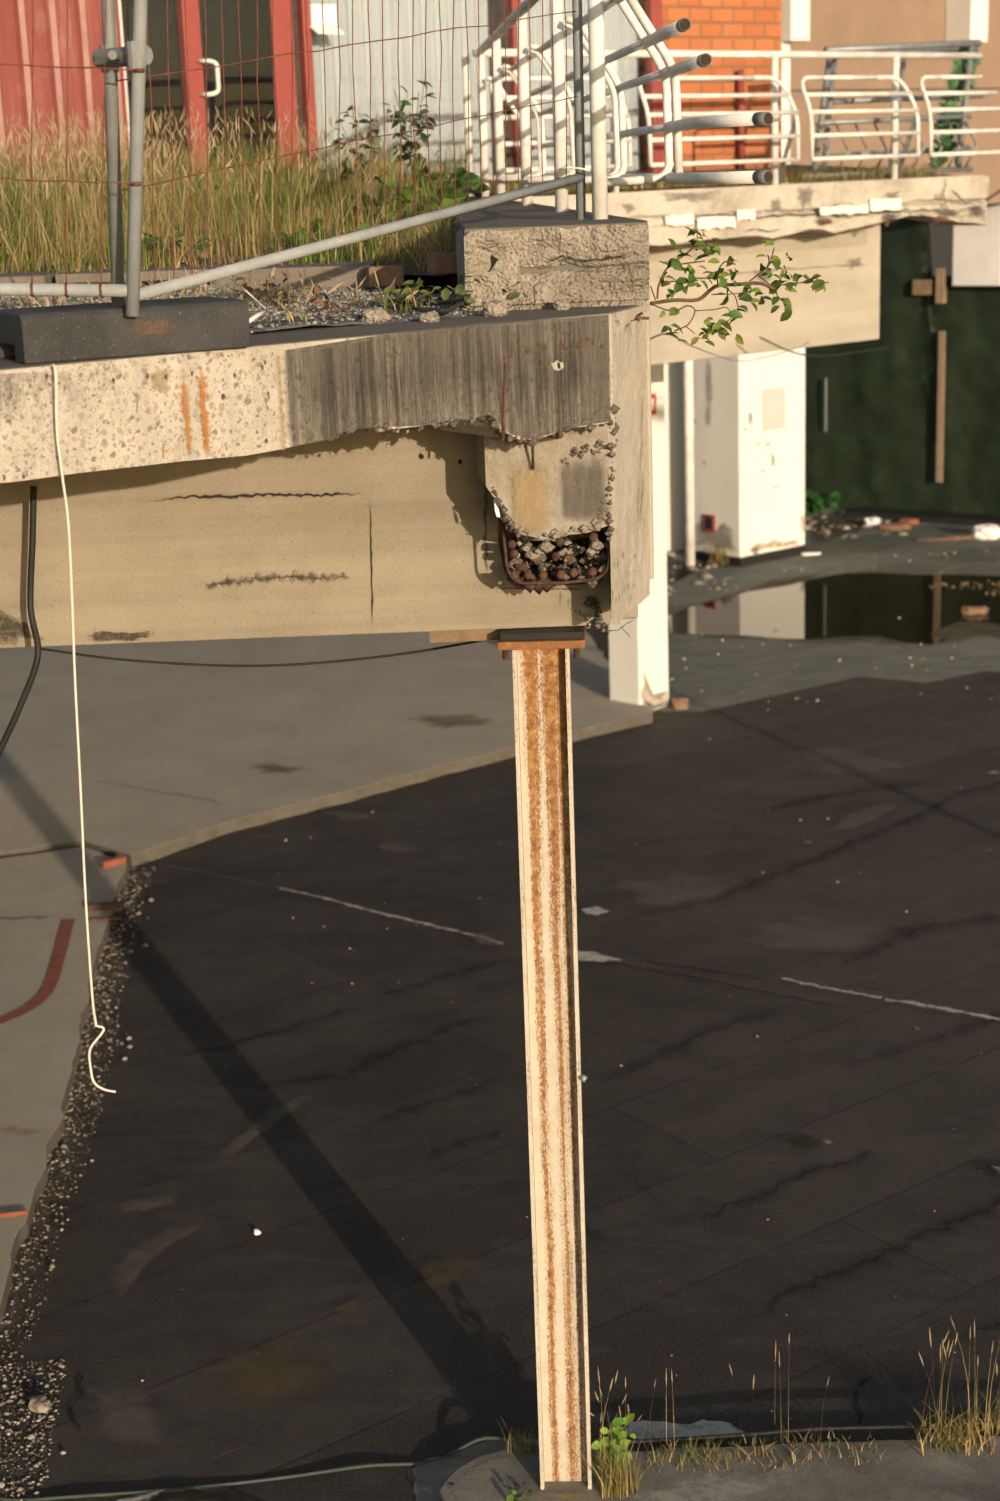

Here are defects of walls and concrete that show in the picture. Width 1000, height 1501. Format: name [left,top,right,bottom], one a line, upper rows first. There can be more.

peeling [665,209,756,230]
peeling [819,197,902,222]
spalling [931,206,985,216]
corrosion [146,371,226,452]
spalling [326,357,620,634]
crack [170,492,373,611]